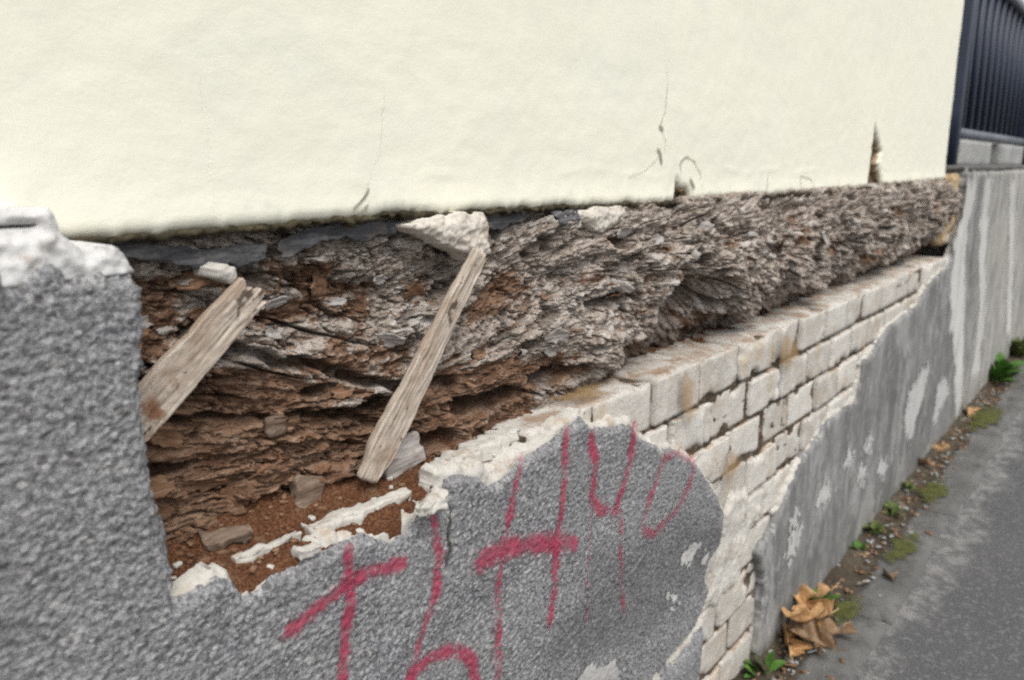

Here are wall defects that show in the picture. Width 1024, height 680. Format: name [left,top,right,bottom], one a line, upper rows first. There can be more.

crack [658,125,701,188]
peeling [310,274,347,306]
peeling [139,313,174,350]
peeling [265,325,285,339]
spalling [767,173,965,516]
spalling [418,406,723,510]
spalling [302,512,416,557]
peeling [681,542,717,568]
peeling [783,506,804,567]
spalling [169,562,229,597]
peeling [577,658,620,680]
spalling [652,618,704,680]